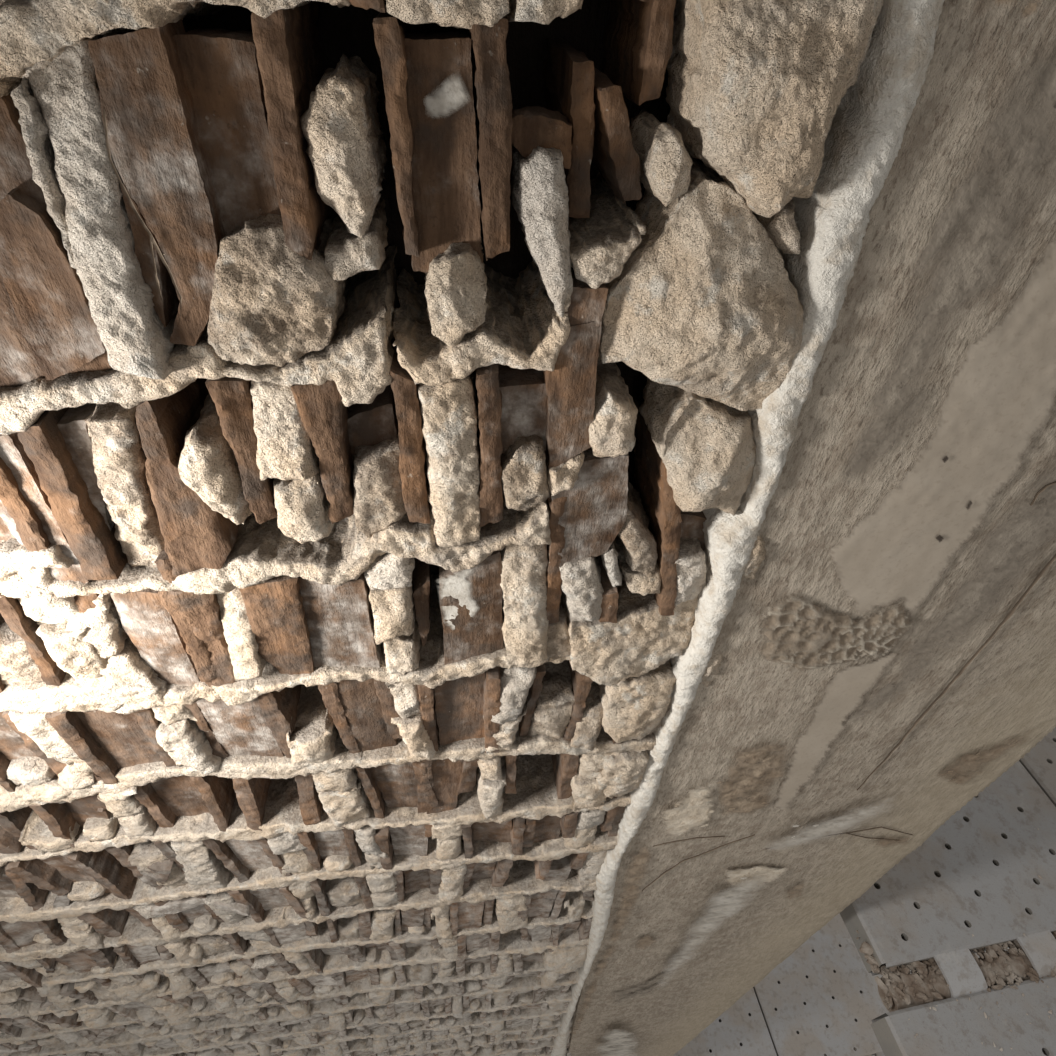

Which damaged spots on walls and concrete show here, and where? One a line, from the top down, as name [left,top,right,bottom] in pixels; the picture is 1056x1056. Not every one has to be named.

crack [857,554,1056,791]
spalling [662,745,785,835]
crack [823,826,913,841]
crack [642,834,776,891]
flaking render [726,866,787,889]